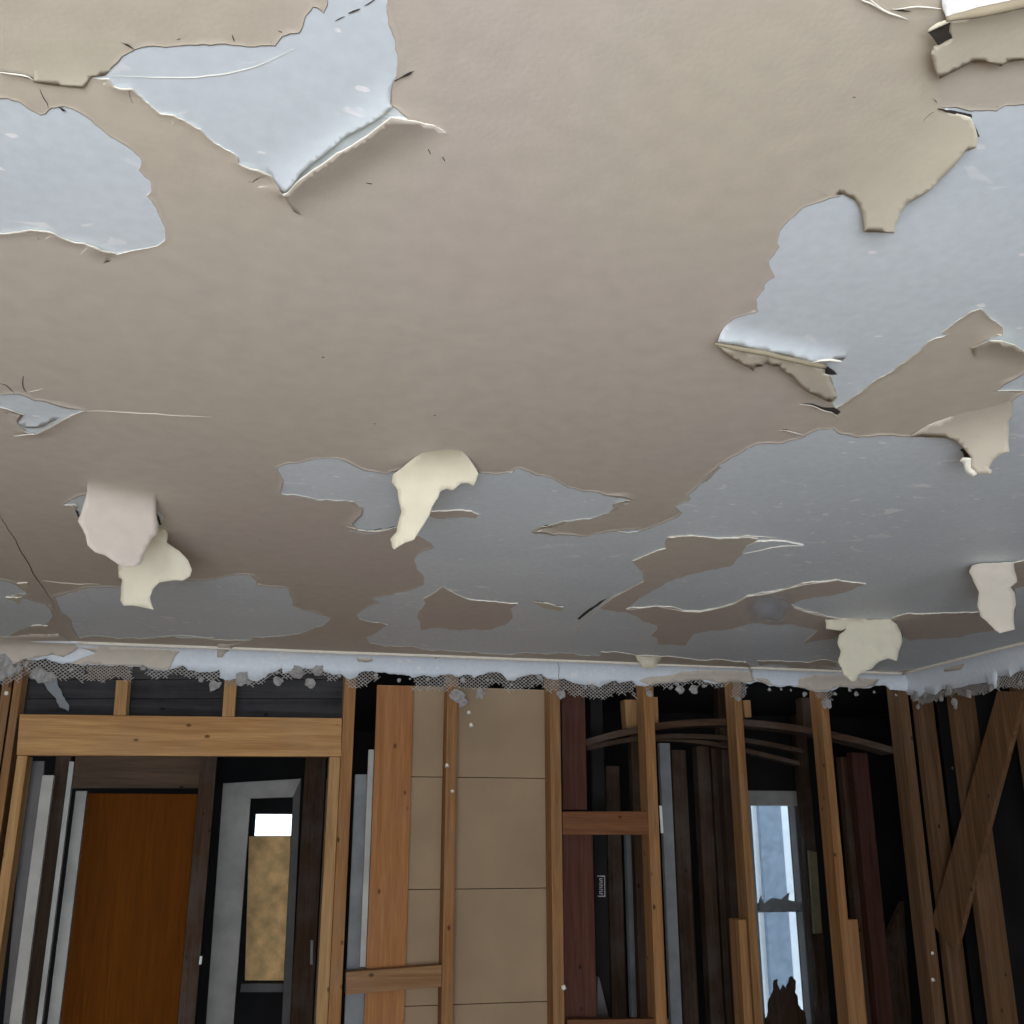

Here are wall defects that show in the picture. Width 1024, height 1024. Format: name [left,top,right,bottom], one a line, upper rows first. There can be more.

peeling [0,0,466,264]
peeling [0,376,92,440]
peeling [273,0,1024,710]
crack [1,518,101,605]
peeling [0,462,380,691]